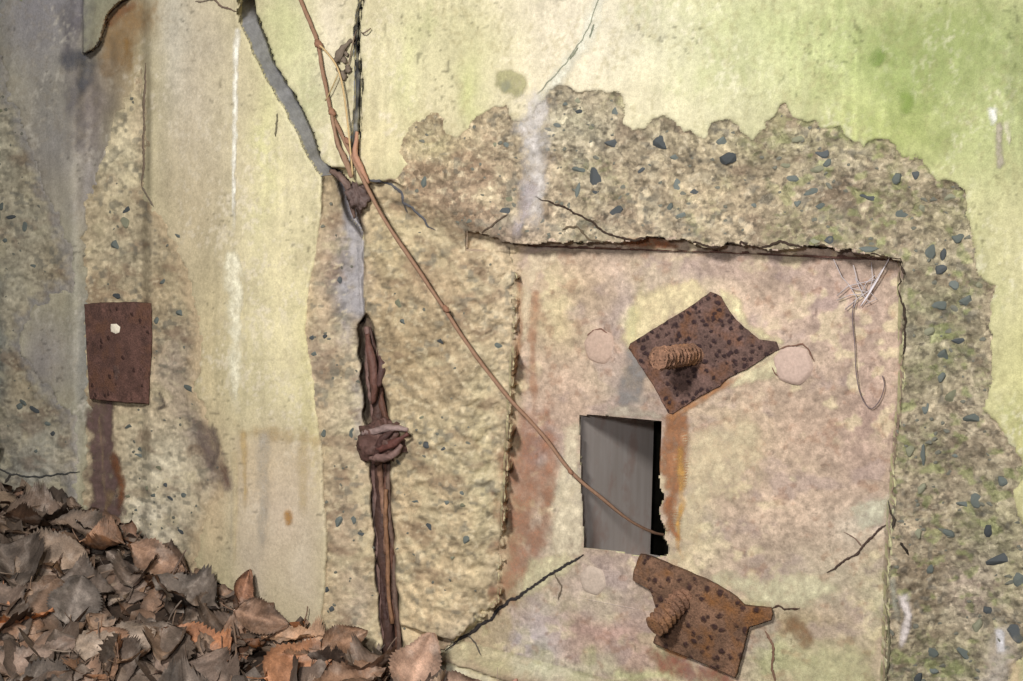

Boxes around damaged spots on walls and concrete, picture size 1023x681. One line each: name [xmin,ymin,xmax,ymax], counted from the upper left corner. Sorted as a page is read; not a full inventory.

crack [195,0,435,230]
peeling [496,70,526,97]
crack [481,214,507,239]
crack [537,197,907,356]
spalling [305,85,1023,681]
rust [86,400,124,517]
rust [660,382,729,541]
crack [445,555,583,655]
damp [992,628,1019,681]